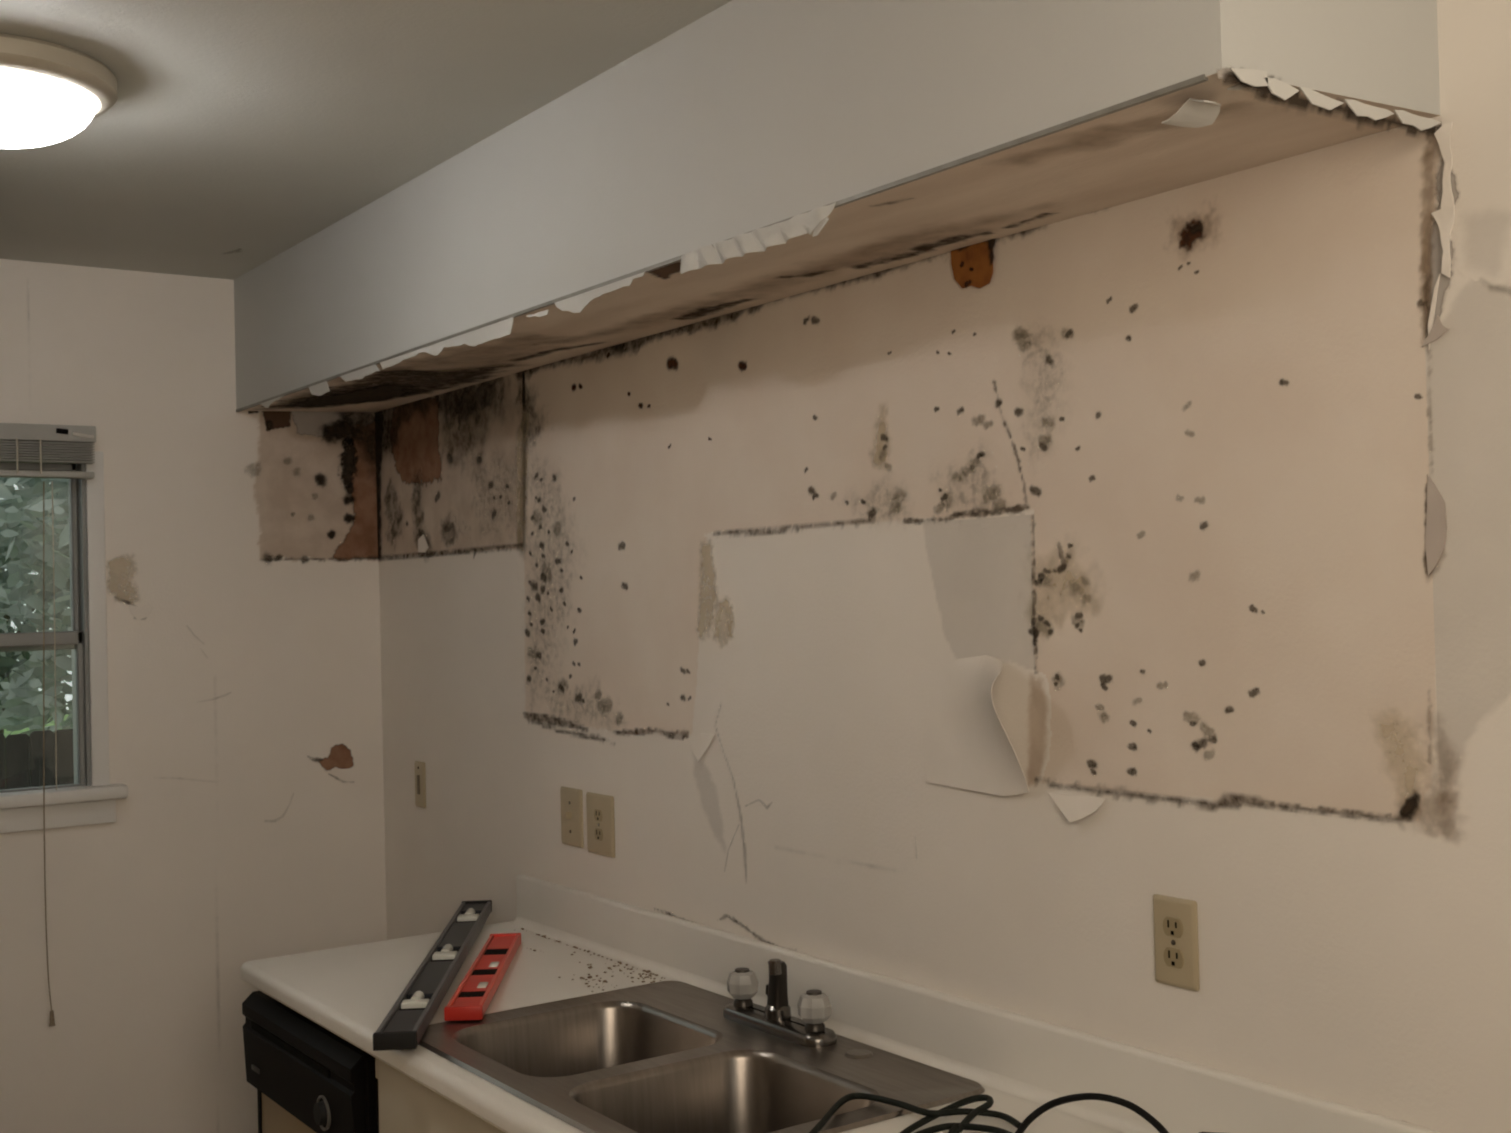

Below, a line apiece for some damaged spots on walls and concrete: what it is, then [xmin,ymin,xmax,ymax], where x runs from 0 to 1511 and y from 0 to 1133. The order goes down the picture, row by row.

damp [781,213,1049,291]
damp [266,299,762,561]
peeling [248,68,1511,824]
damp [804,467,902,517]
damp [525,473,611,711]
damp [1035,544,1077,592]
damp [1029,615,1053,636]
damp [1097,675,1112,720]
damp [1184,714,1217,751]
damp [1400,793,1419,817]